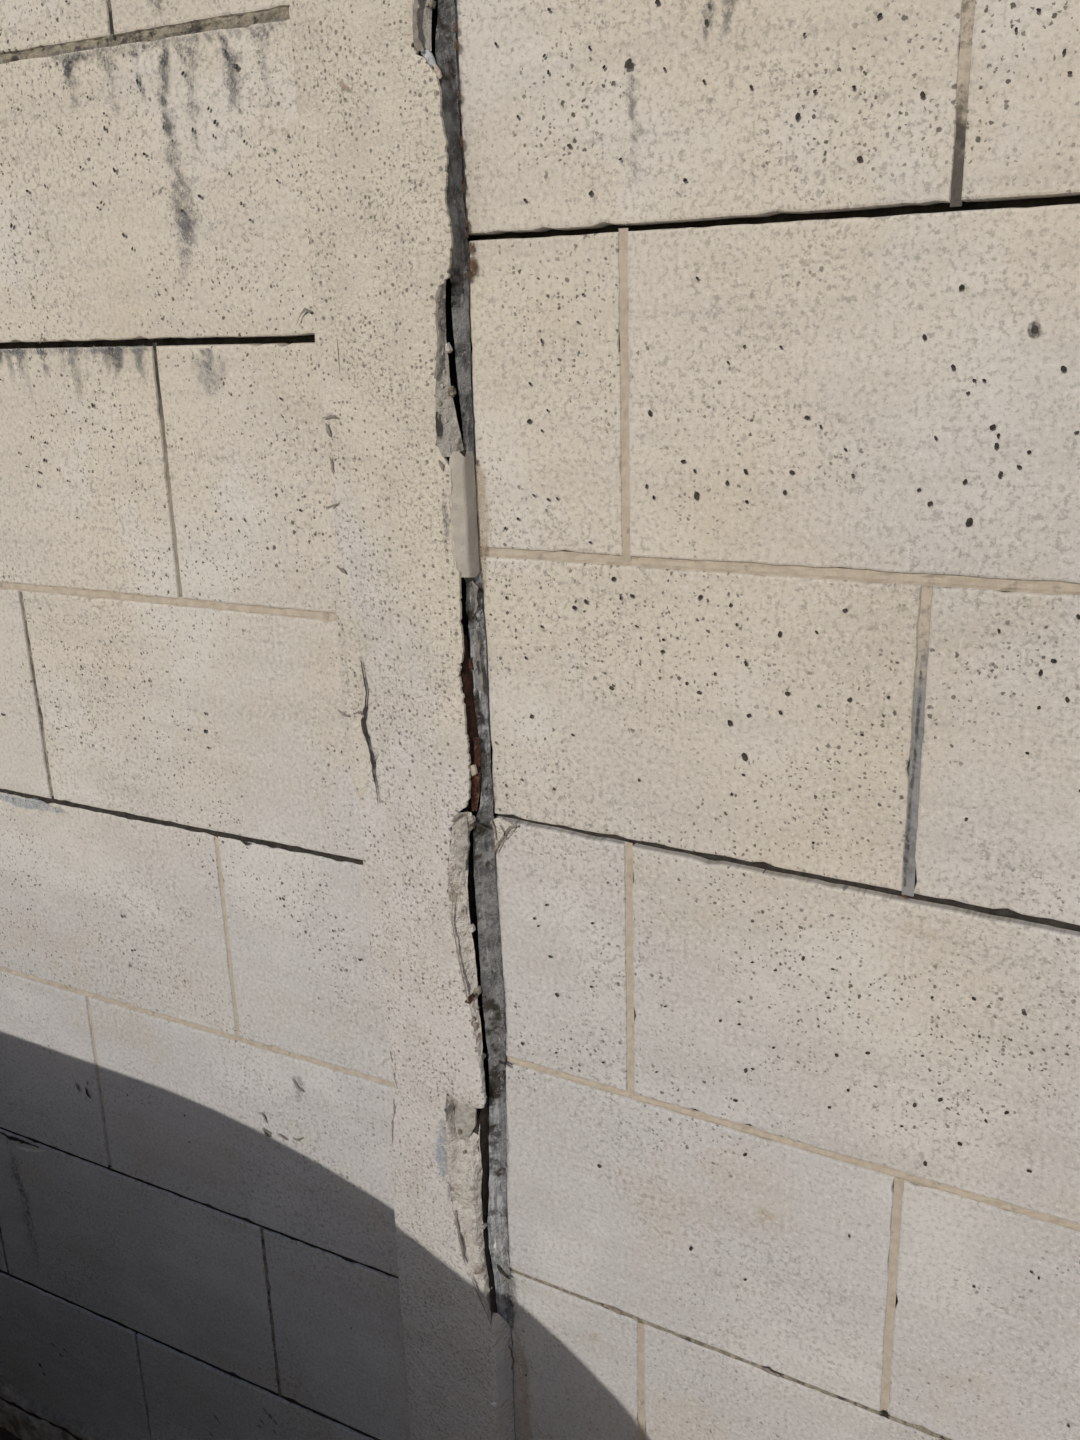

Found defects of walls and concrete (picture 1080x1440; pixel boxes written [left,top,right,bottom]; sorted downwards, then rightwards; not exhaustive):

water stain [62,54,84,101]
water stain [220,36,237,103]
water stain [136,45,195,255]
crack [354,661,378,802]
corrosion [460,635,482,812]
crack [474,817,517,854]
spalling [446,812,493,1324]